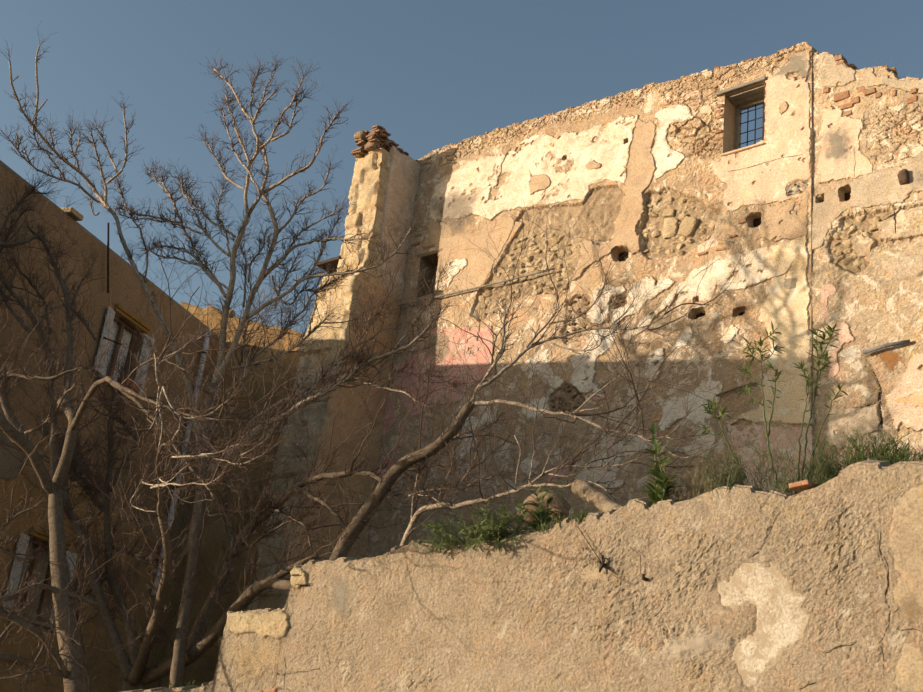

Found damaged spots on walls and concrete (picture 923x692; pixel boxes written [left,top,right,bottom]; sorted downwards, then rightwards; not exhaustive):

flaking render [428,50,923,426]
flaking render [452,407,493,459]
flaking render [517,388,649,491]
flaking render [658,365,724,458]
flaking render [828,353,923,450]
spalling [718,562,811,688]
crack [879,530,920,668]